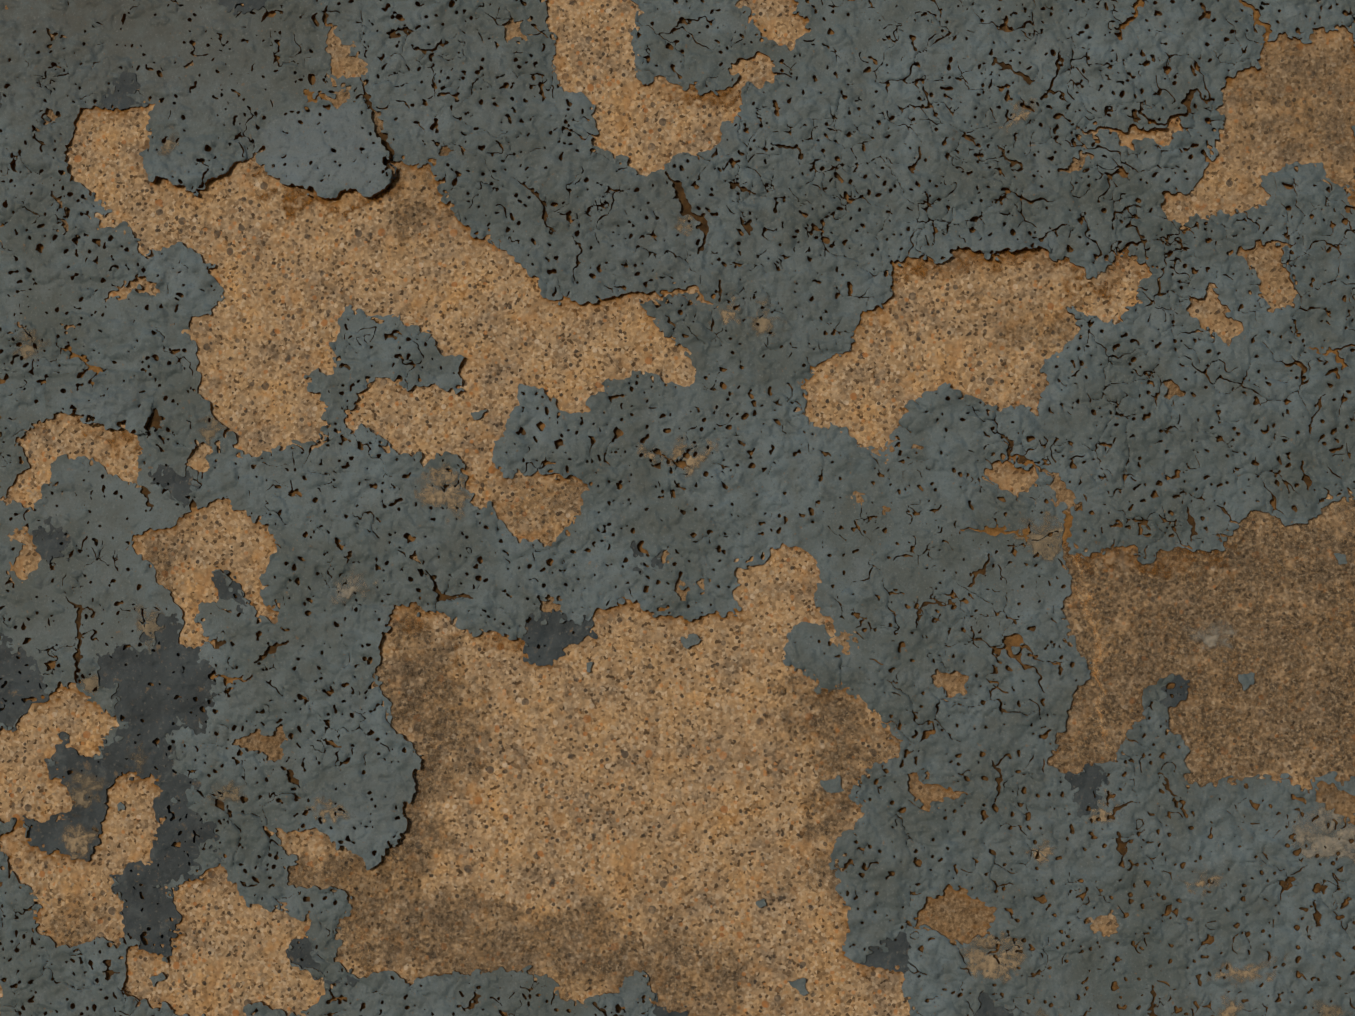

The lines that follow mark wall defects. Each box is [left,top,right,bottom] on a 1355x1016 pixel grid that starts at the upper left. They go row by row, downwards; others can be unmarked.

peeling [36,23,719,547]
crack [514,178,583,284]
peeling [497,0,811,176]
crack [665,173,709,254]
crack [725,180,756,235]
peeling [795,220,1160,464]
crack [991,54,1069,110]
crack [1111,202,1147,252]
crack [1133,89,1209,123]
peeling [1150,21,1355,229]
peeling [0,682,333,1016]
peeling [264,543,918,1016]